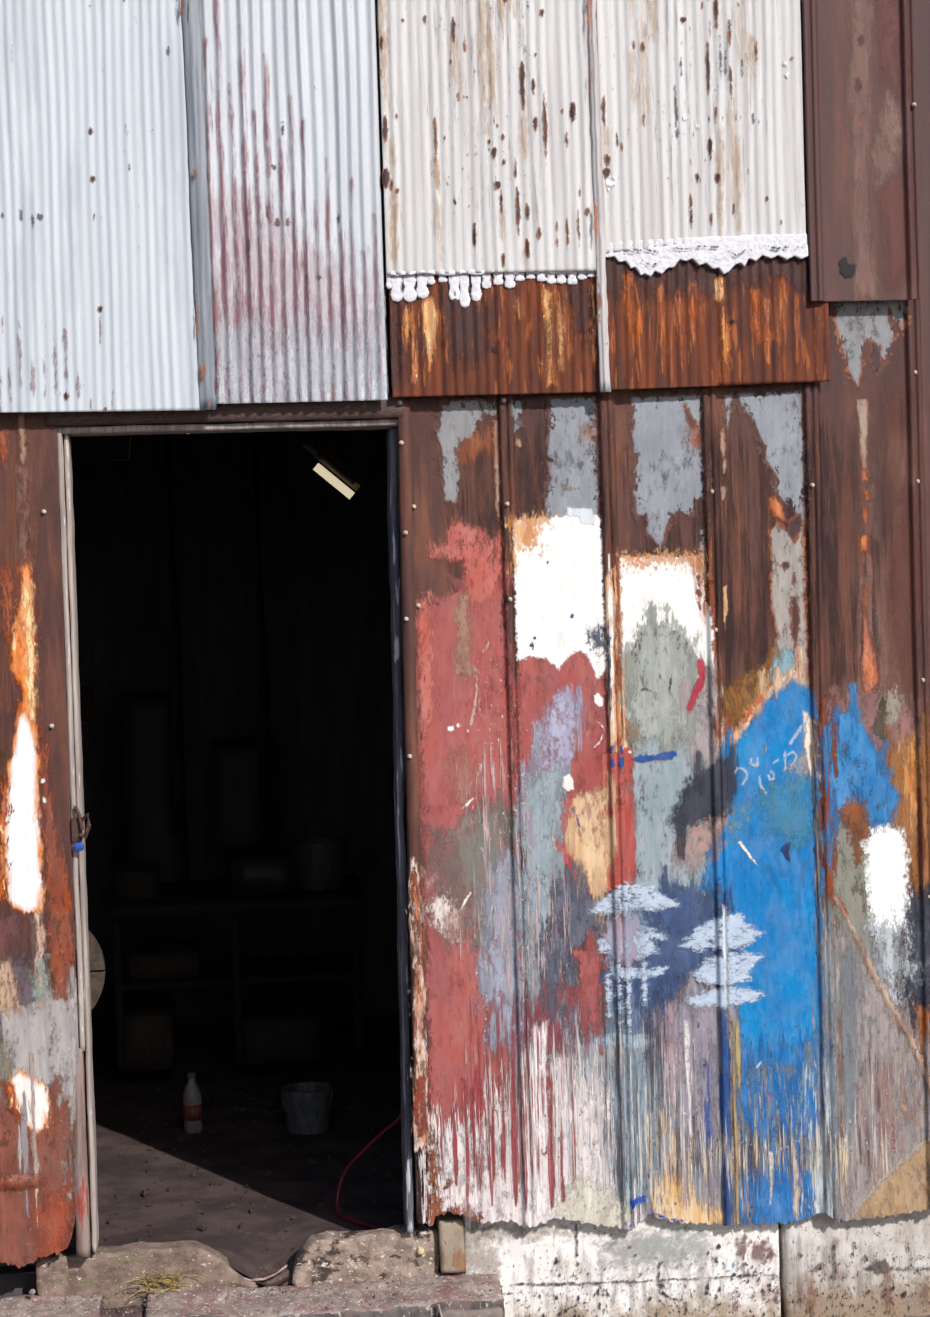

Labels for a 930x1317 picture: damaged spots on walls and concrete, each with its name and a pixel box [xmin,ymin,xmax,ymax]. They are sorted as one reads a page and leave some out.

corrosion [848,0,913,299]
corrosion [390,283,493,386]
corrosion [452,410,559,613]
peeling [432,393,608,522]
corrosion [537,240,809,389]
peeling [624,383,817,707]
peeling [829,300,916,557]
corrosion [0,412,76,1001]
corrosion [0,1075,76,1268]
peeling [408,858,732,1230]
peeling [789,1059,837,1218]
spalling [243,1260,293,1288]